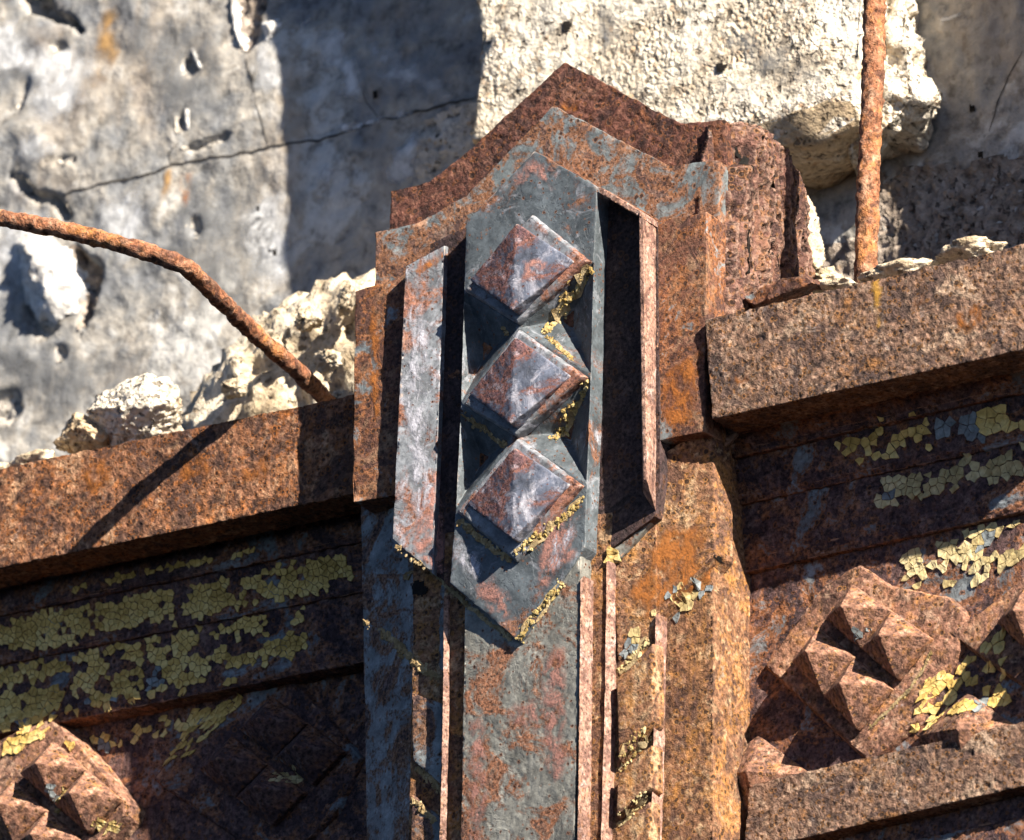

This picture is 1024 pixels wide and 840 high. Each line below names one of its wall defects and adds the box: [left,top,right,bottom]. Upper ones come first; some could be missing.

crack [62,58,477,249]
spalling [877,154,1024,265]
spalling [70,244,103,330]
rust [664,360,695,423]
peeling [834,404,1024,509]
rust [415,476,444,572]
rust [541,512,573,584]
rust [633,530,710,616]
peeling [900,519,1024,590]
peeling [0,554,355,766]
rust [516,649,565,777]
peeling [868,627,1012,733]